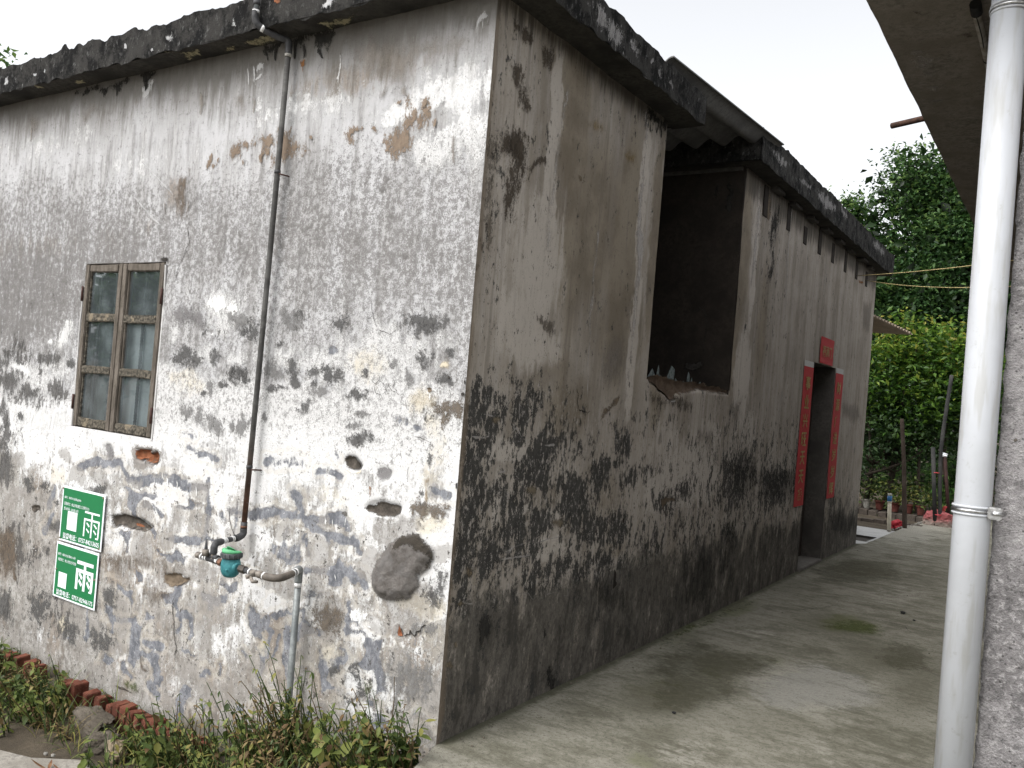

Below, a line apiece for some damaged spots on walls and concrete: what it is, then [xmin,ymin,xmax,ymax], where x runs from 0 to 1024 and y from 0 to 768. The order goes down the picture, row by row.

water stain [509,64,532,114]
water stain [164,170,190,215]
flaking render [205,127,312,169]
flaking render [344,95,437,162]
water stain [497,115,560,224]
water stain [0,452,58,505]
spalling [131,444,163,470]
spalling [345,455,361,474]
spalling [110,514,152,532]
spalling [365,501,401,519]
water stain [26,554,149,657]
water stain [308,592,371,645]